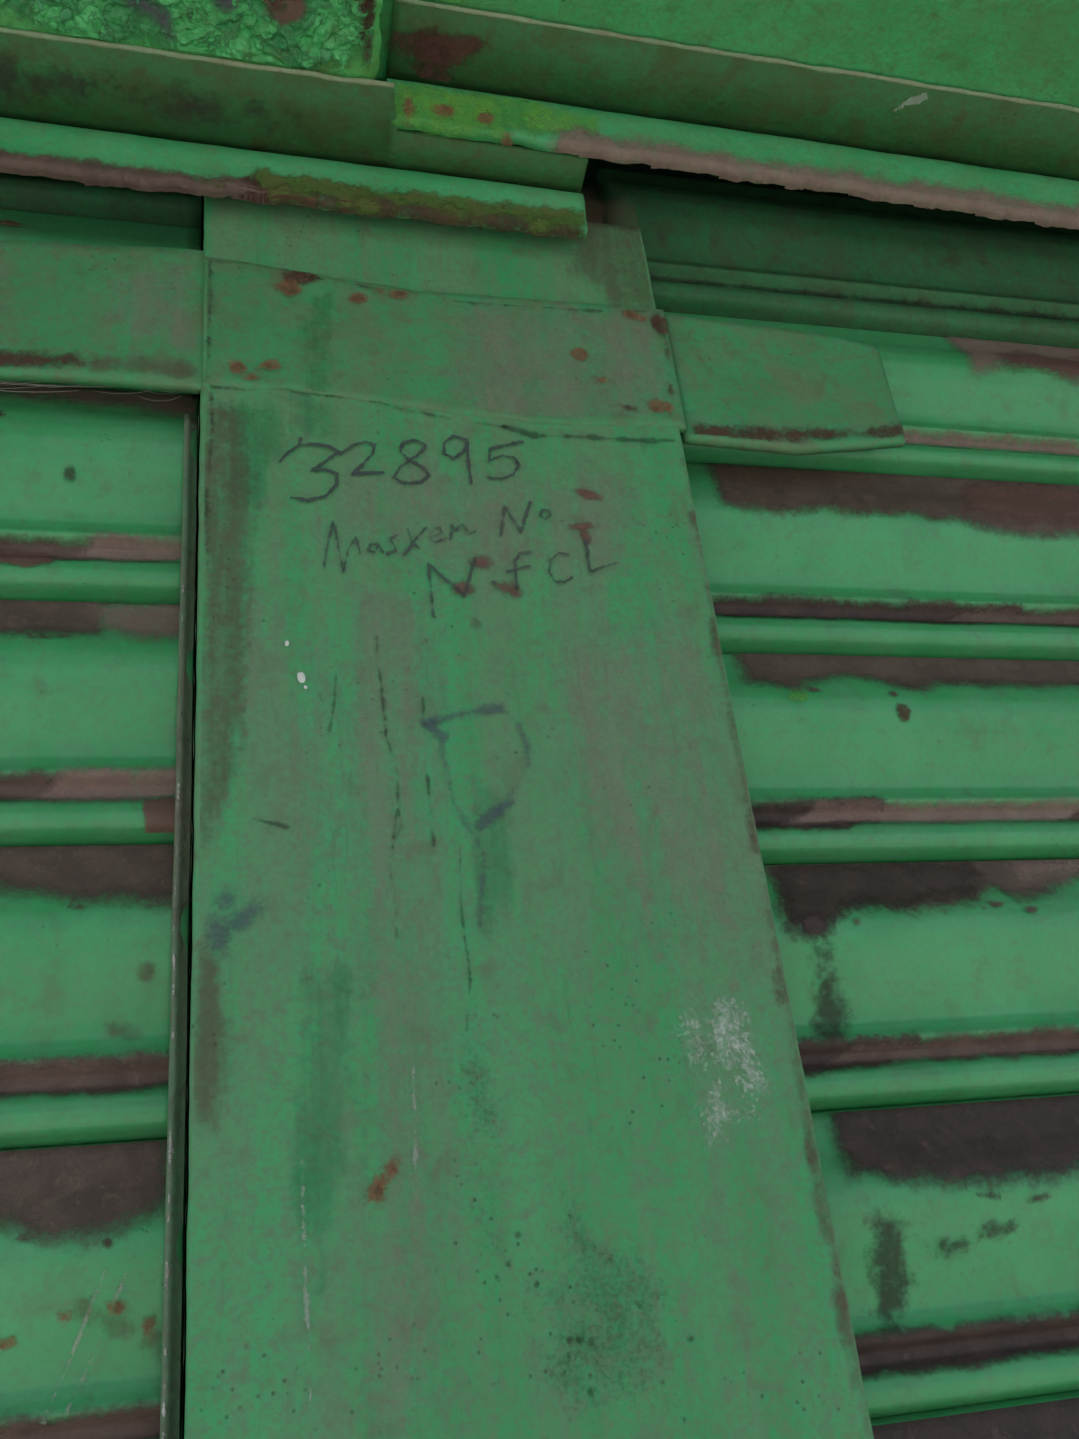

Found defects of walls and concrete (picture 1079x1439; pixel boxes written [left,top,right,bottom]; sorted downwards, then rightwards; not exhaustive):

rust [355,0,377,60]
rust [0,149,584,239]
rust [275,270,318,296]
rust [0,350,80,367]
rust [624,311,669,353]
rust [695,423,904,442]
peeling [707,463,1079,537]
peeling [735,653,1079,721]
peeling [0,767,185,908]
peeling [765,859,1079,938]
peeling [830,1095,1079,1201]
peeling [0,1131,173,1247]